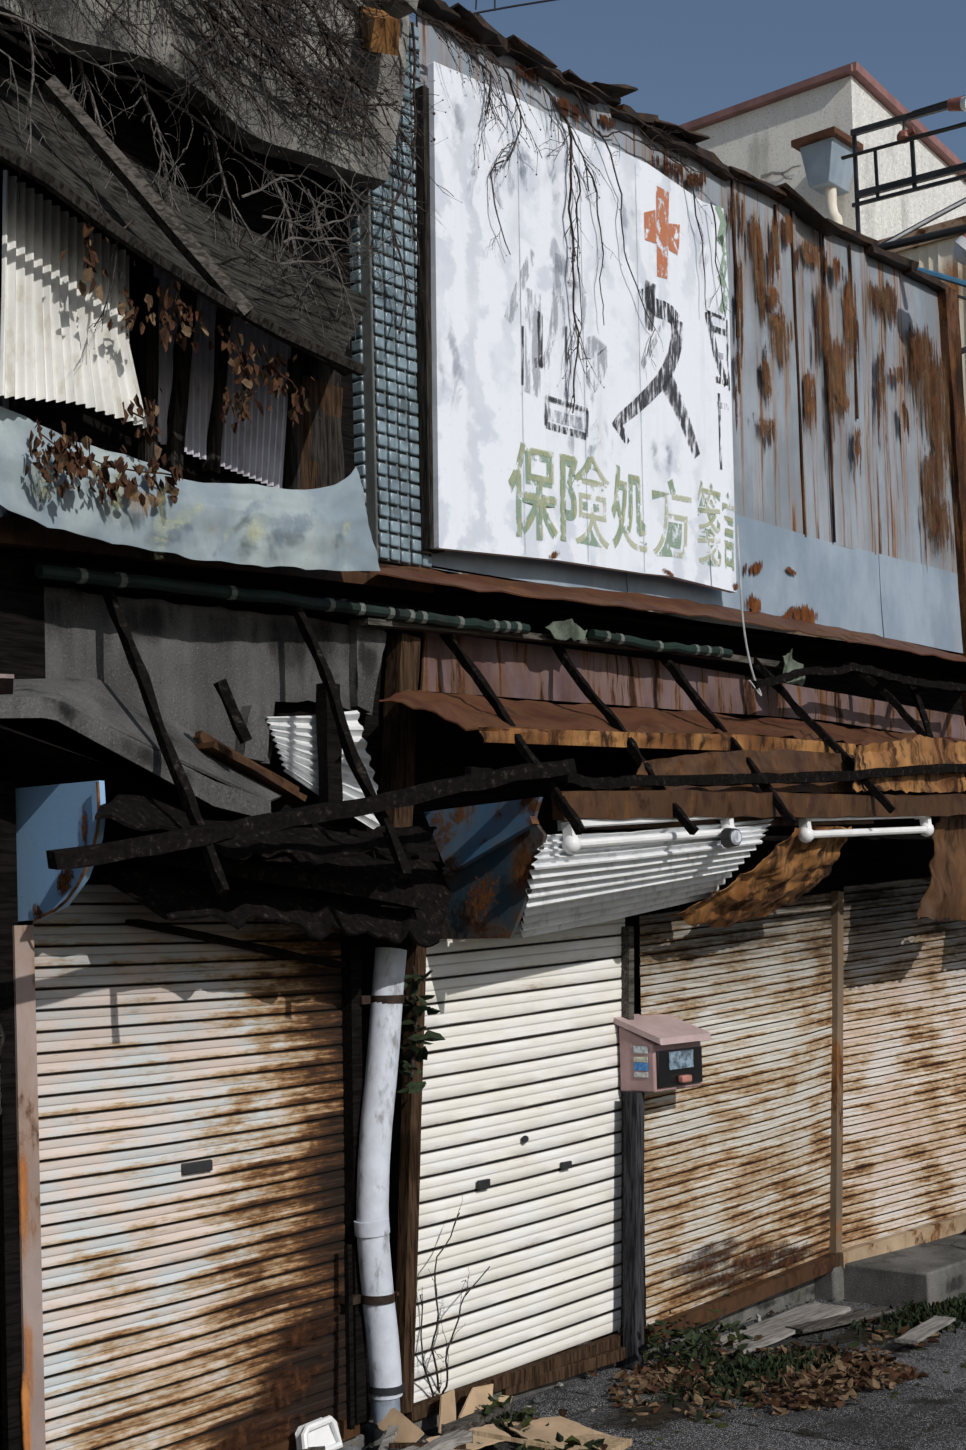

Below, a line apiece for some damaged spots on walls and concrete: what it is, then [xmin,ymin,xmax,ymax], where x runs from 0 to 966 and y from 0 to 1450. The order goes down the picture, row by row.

corrosion [728,192,960,567]
corrosion [57,869,74,895]
corrosion [465,849,532,923]
corrosion [676,1237,814,1302]
corrosion [206,1316,335,1450]